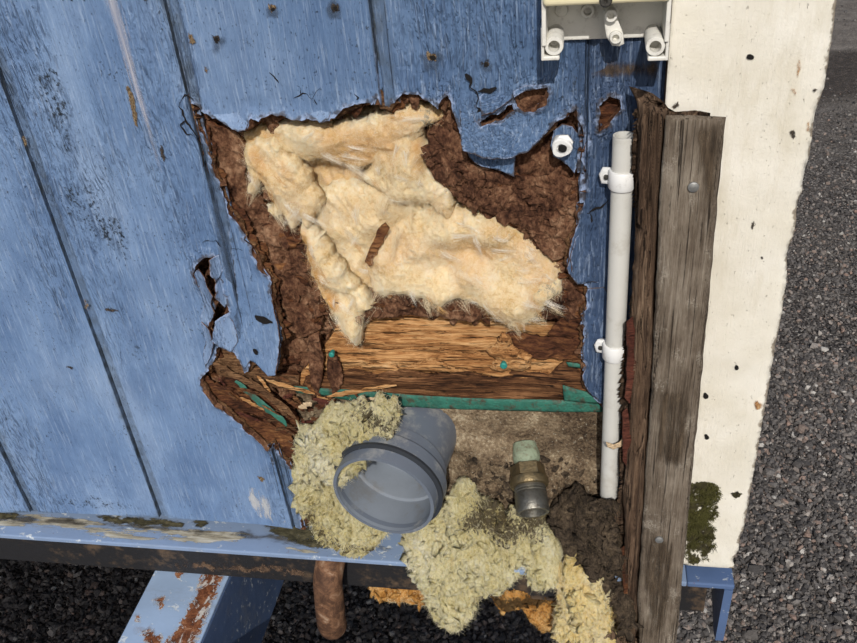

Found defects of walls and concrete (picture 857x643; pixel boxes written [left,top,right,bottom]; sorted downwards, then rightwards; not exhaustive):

peeling [311,110,331,123]
spalling [600,97,620,127]
peeling [421,82,607,402]
peeling [193,112,324,460]
peeling [327,351,344,394]
peeling [0,514,247,543]
corrosion [135,562,303,643]